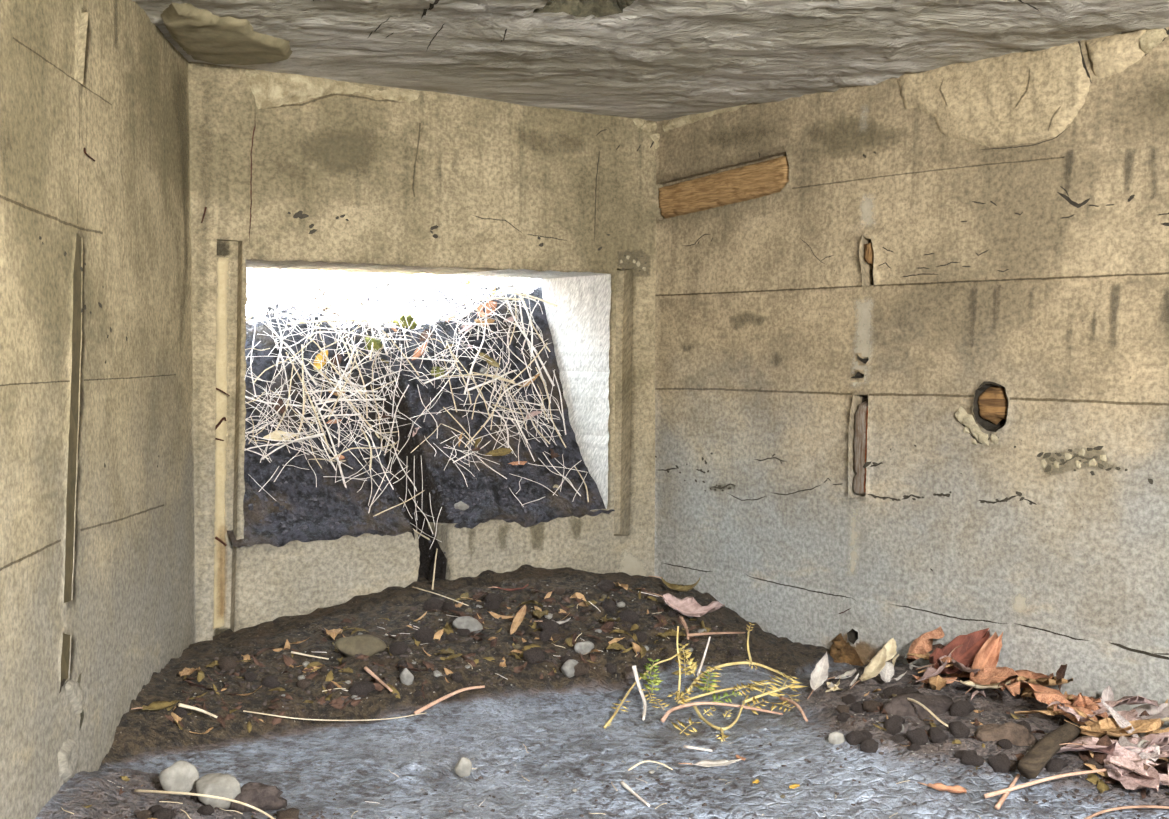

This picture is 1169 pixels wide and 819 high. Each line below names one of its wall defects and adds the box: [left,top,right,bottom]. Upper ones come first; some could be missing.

spalling [533,0,642,29]
water stain [1124,152,1132,182]
flaking render [1040,448,1107,469]